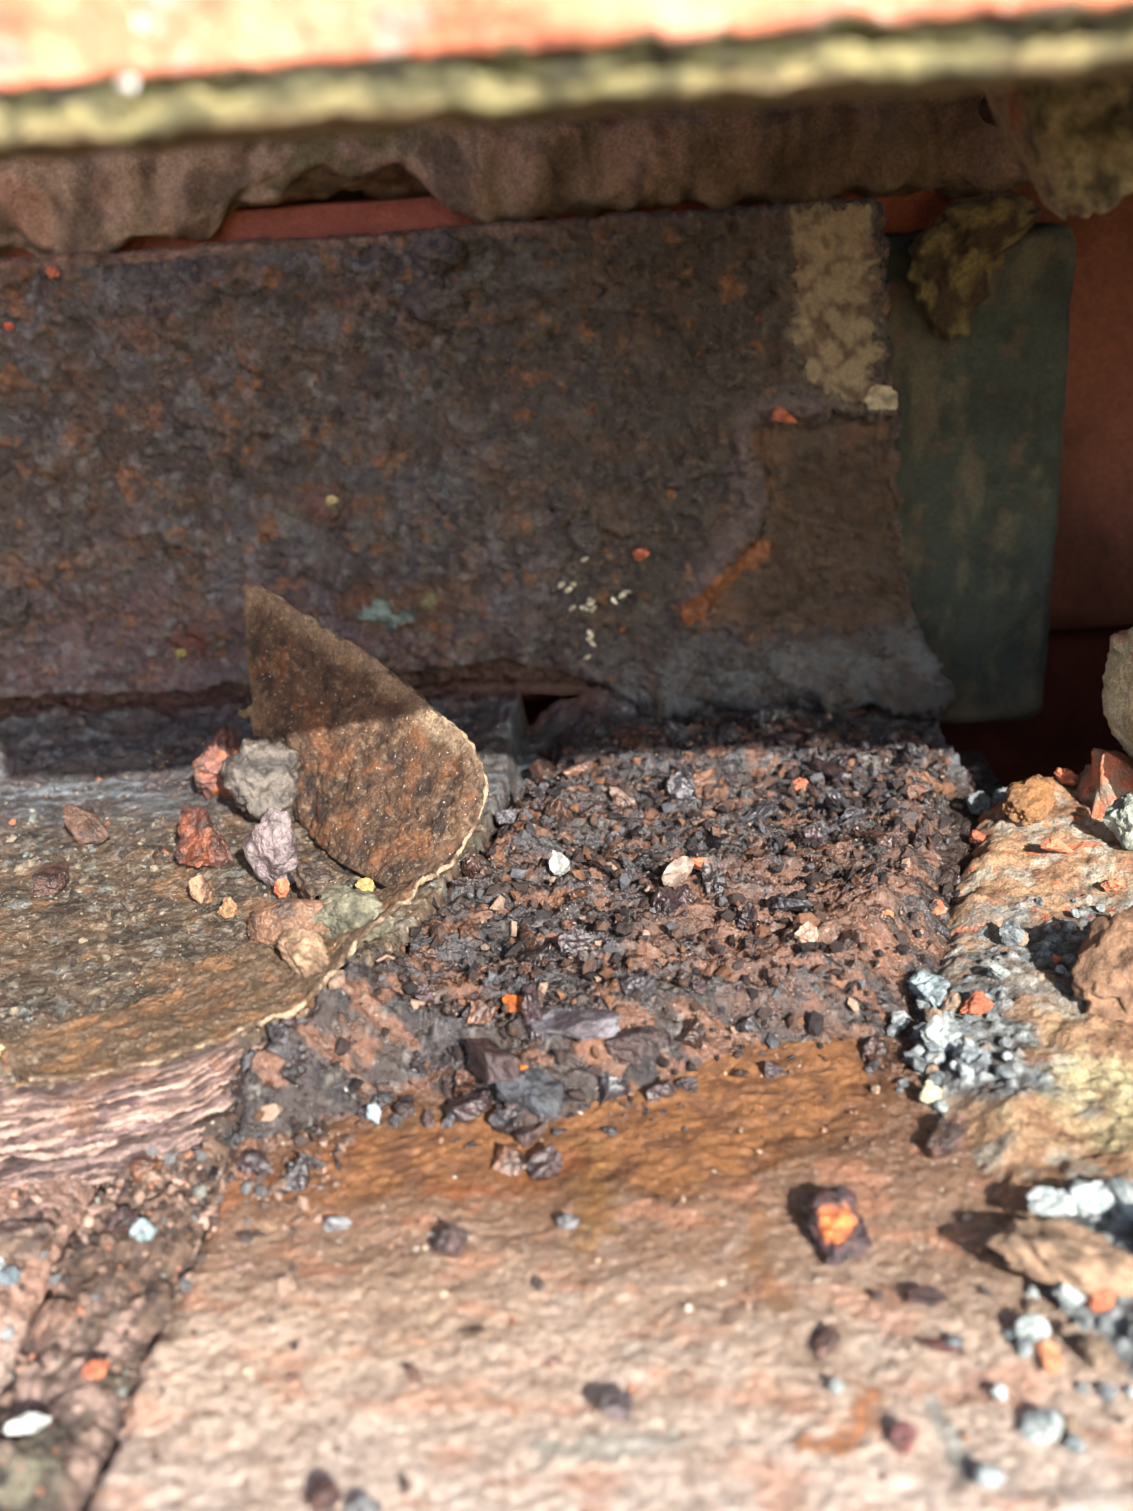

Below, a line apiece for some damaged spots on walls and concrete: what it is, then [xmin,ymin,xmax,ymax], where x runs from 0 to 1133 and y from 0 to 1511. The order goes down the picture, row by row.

peeling [342,584,442,631]
rust [217,1033,887,1213]
crack [0,1356,45,1424]